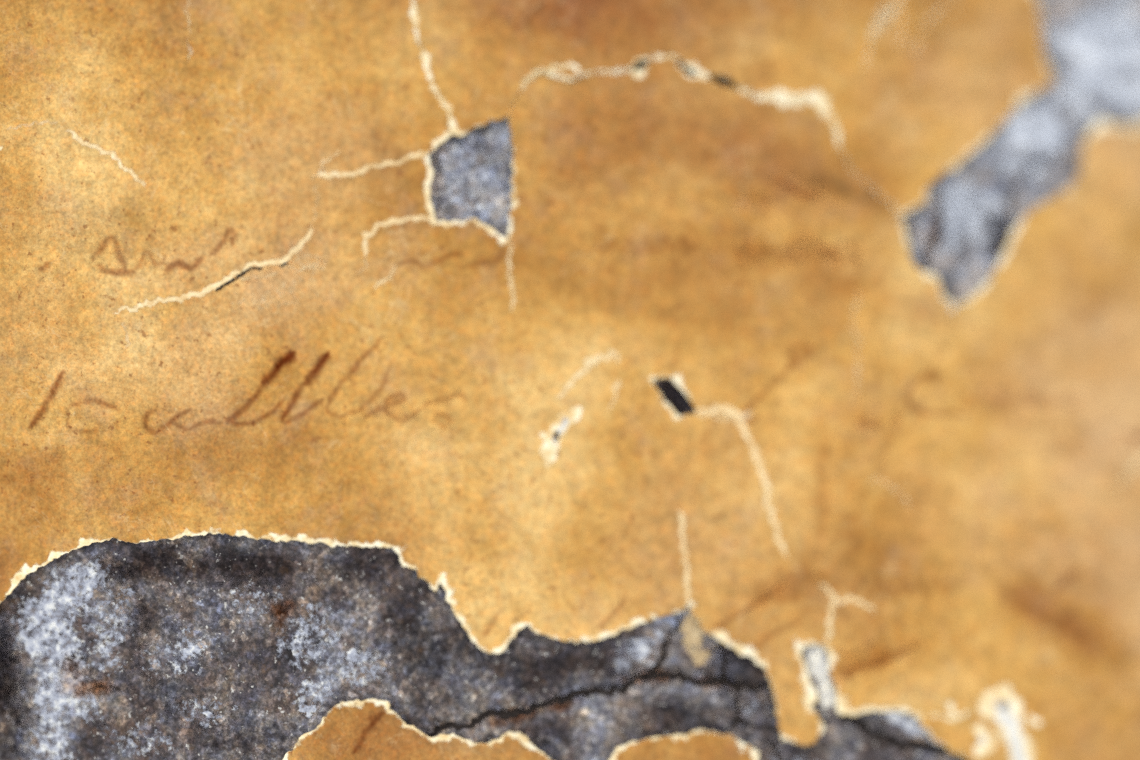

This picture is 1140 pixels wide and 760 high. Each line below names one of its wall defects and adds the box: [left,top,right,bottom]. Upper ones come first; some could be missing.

crack [630,60,651,71]
crack [678,61,745,90]
peeling [988,0,1140,179]
crack [924,196,943,270]
peeling [540,406,583,467]
peeling [11,559,173,760]
peeling [142,627,223,681]
peeling [230,583,387,718]
peeling [615,630,664,672]
peeling [681,610,717,667]
peeling [805,644,837,717]
peeling [879,684,1041,760]